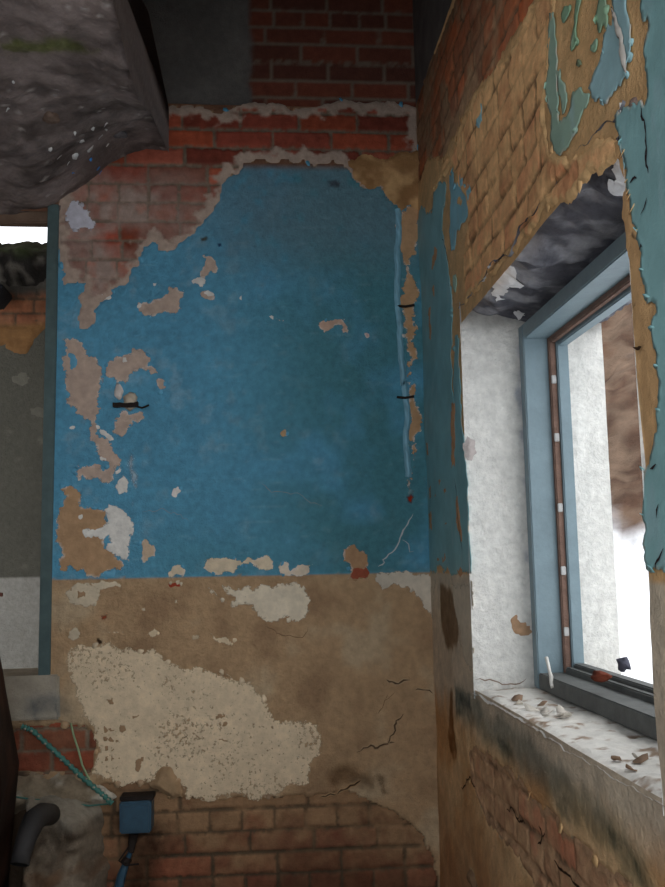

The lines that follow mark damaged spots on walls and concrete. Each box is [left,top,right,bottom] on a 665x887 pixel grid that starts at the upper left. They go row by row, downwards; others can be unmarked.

spalling [48,0,665,671]
spalling [13,627,438,887]
crack [357,678,433,753]
crack [507,806,545,844]
spalling [469,746,633,887]
crack [554,860,580,887]